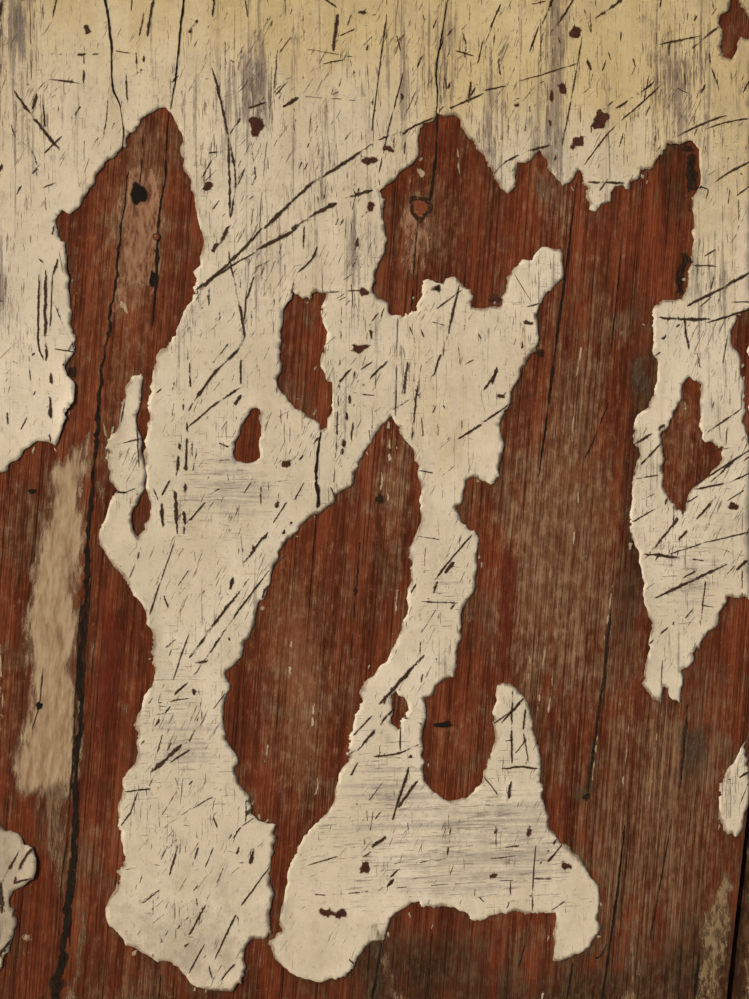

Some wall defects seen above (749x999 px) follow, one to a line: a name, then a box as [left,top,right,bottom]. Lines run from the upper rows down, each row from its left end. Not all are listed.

peeling [718,0,749,59]
crack [32,670,43,728]
crack [51,0,185,999]
peeling [0,108,571,999]
peeling [372,109,749,999]